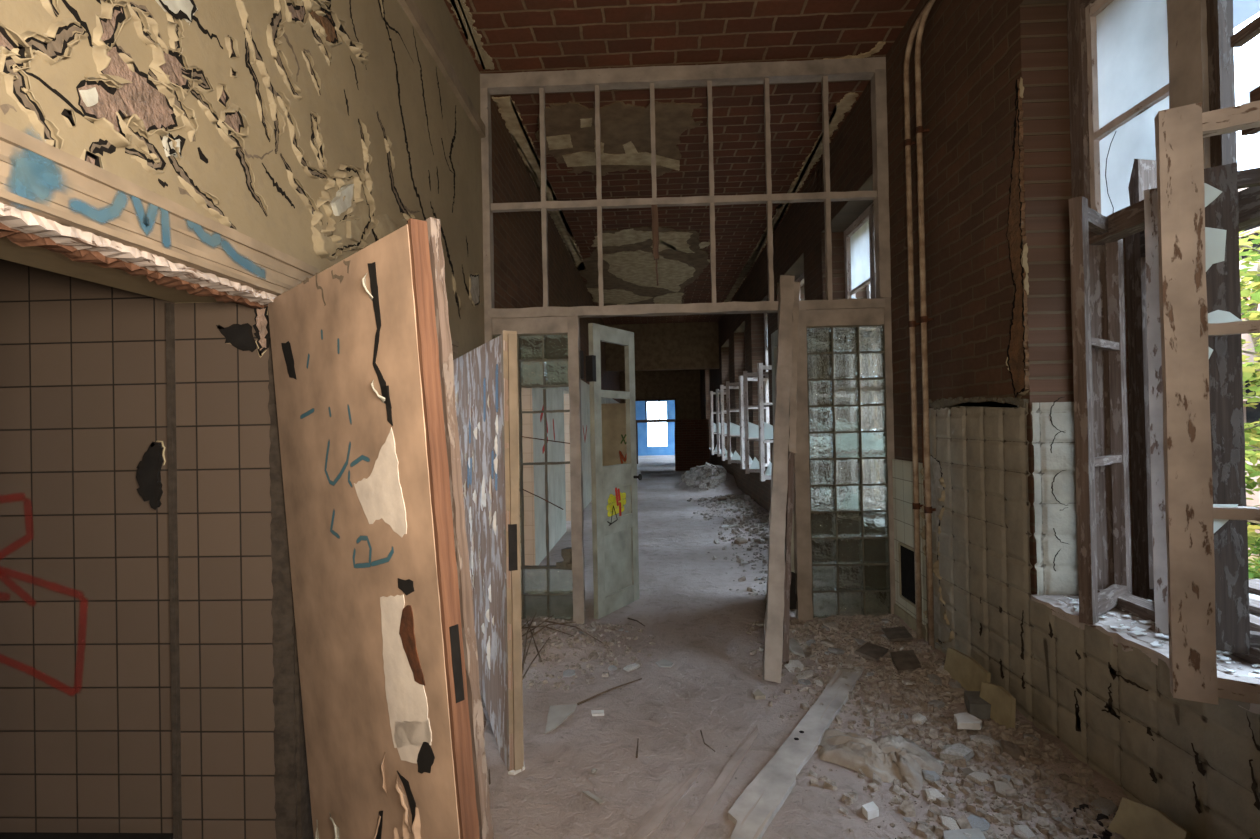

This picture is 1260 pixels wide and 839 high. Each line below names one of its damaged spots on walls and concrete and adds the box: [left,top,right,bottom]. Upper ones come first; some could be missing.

spalling [0,0,420,261]
crack [326,0,473,309]
spalling [136,441,166,510]
crack [979,597,1157,784]
crack [1191,743,1206,814]
crack [1246,712,1260,839]